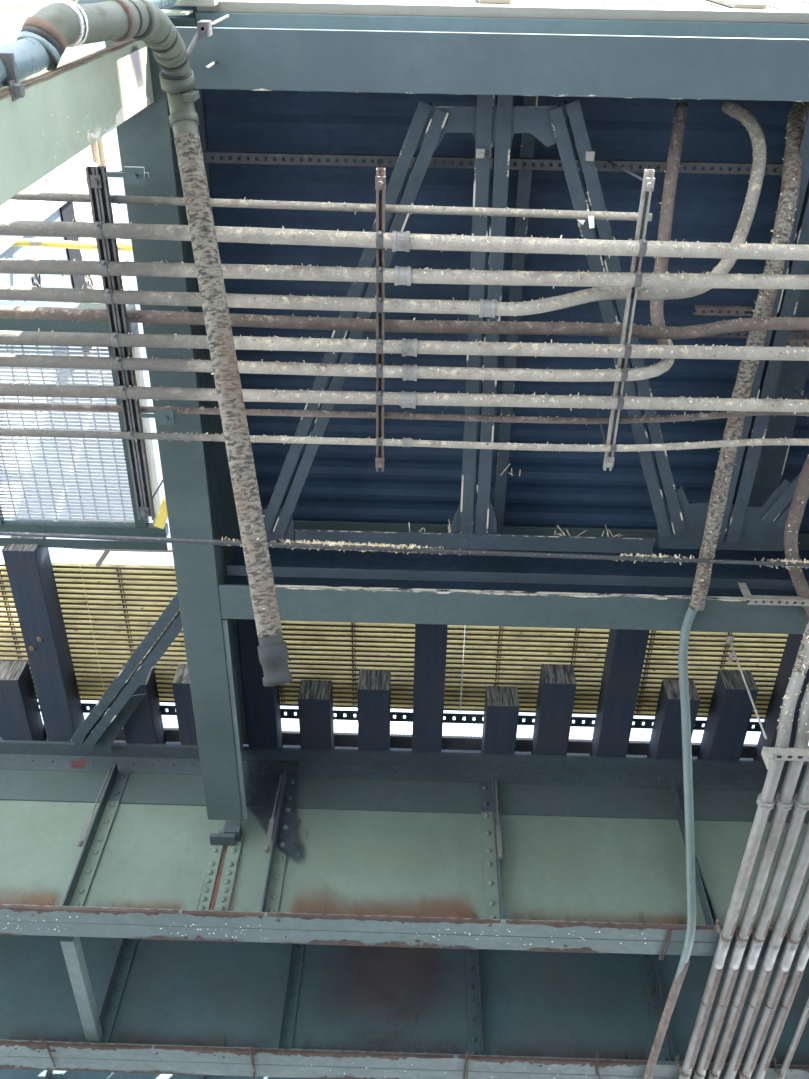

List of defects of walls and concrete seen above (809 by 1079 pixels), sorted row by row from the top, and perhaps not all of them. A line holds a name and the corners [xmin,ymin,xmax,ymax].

peeling [0,904,723,930]
rust [292,901,474,918]
peeling [279,936,482,950]
rust [350,946,438,1021]
peeling [0,1040,648,1068]
peeling [0,1065,192,1075]